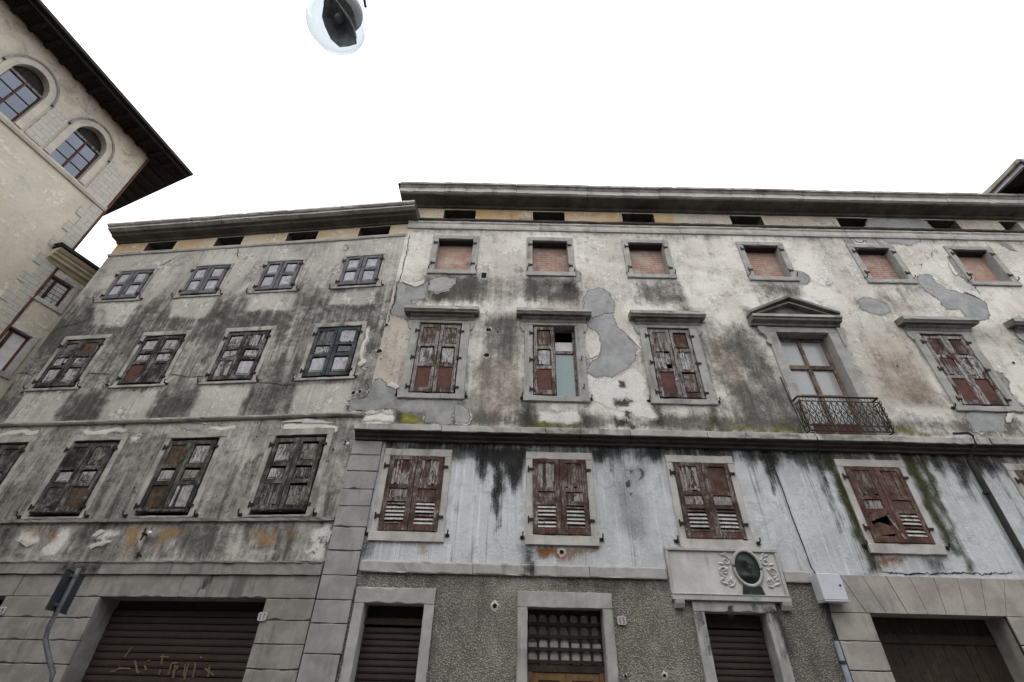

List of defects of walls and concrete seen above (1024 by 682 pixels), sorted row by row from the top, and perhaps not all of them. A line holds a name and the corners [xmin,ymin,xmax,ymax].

water stain [528,279,579,298]
flaking render [947,255,985,302]
peeling [588,336,601,358]
water stain [716,333,790,415]
flaking render [360,409,396,423]
water stain [390,442,525,515]
water stain [918,454,1000,571]
peeling [16,527,72,559]
peeling [87,529,120,549]
flaking render [304,523,332,561]